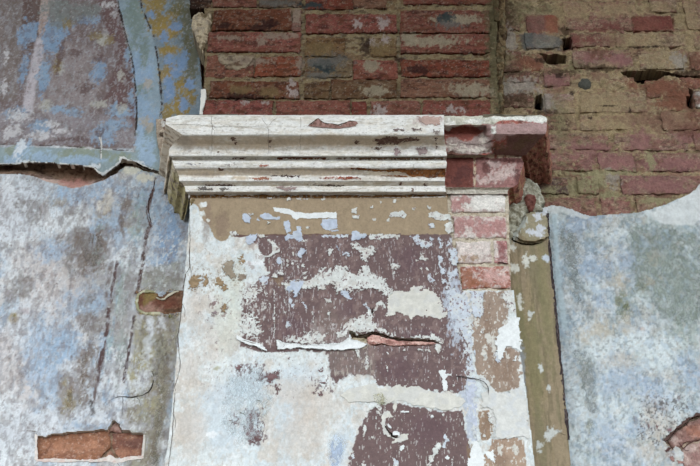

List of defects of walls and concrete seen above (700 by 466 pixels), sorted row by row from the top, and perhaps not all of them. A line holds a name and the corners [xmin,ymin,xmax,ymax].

spalling [135,114,552,466]
crack [111,372,154,413]
spalling [34,423,146,463]
spalling [663,413,700,466]